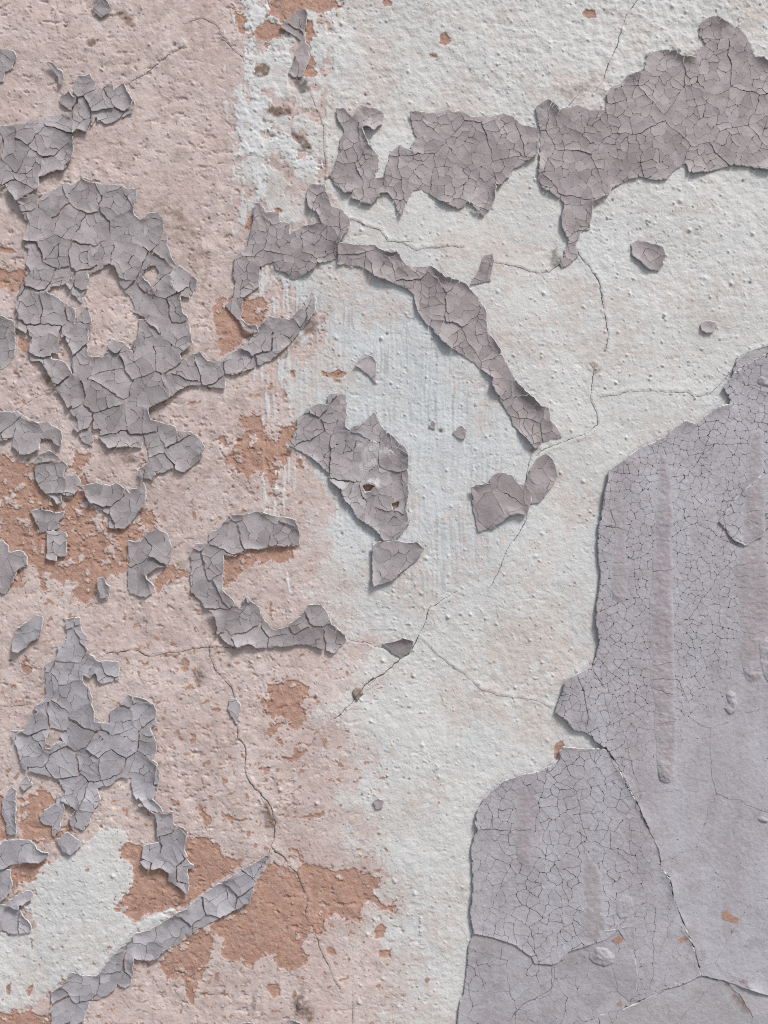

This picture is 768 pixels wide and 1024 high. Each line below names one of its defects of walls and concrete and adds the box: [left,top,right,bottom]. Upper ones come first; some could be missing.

spalling [0,16,768,654]
crack [498,245,609,351]
crack [525,346,768,482]
crack [109,646,235,697]
crack [328,590,552,724]
crack [574,663,606,726]
peeling [457,345,768,1024]
spalling [0,615,398,1024]
crack [236,724,353,1024]